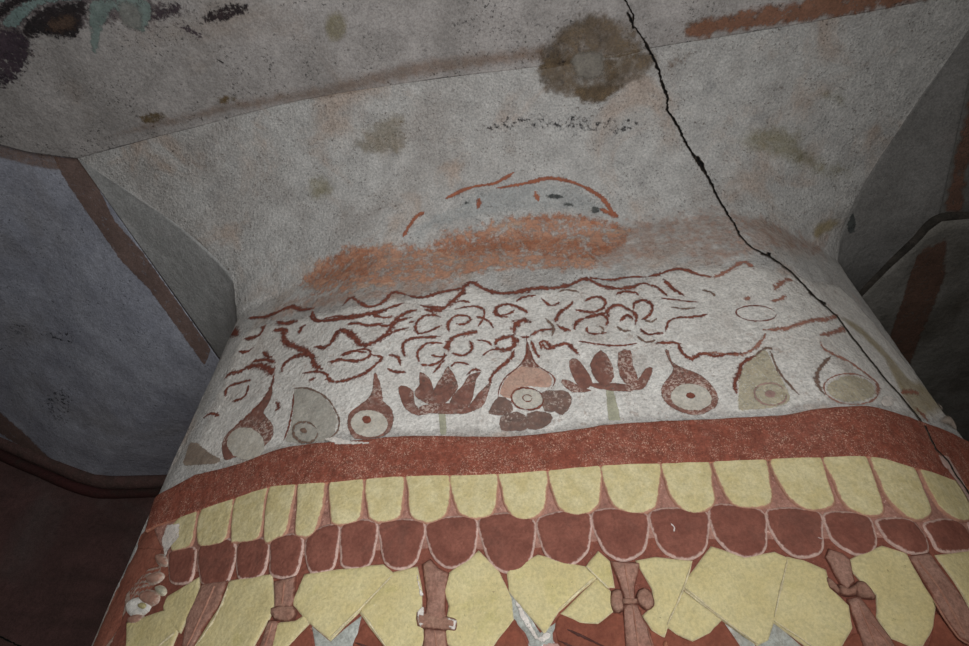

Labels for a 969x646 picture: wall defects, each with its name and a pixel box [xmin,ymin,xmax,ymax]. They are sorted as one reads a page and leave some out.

water stain [540,15,653,101]
crack [624,0,969,494]